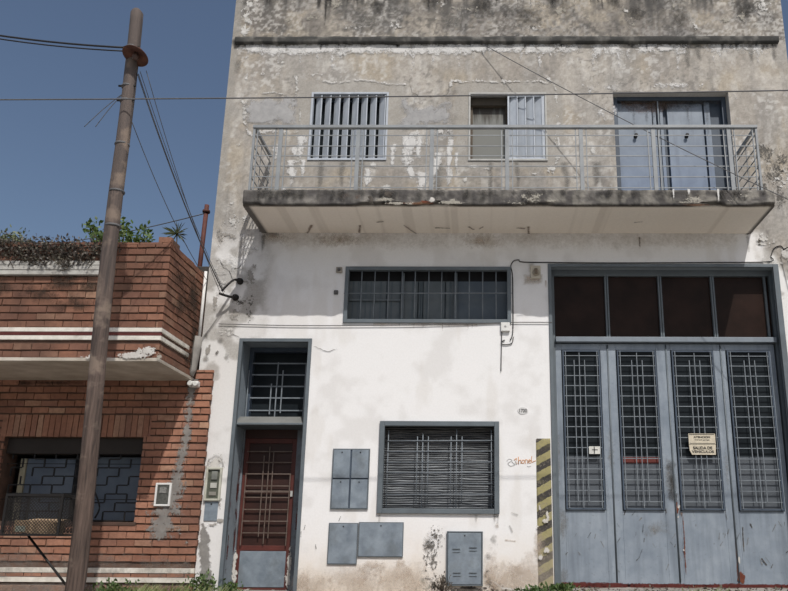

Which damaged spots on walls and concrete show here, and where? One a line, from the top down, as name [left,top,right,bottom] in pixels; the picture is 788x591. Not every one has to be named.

peeling [449,76,558,102]
peeling [390,99,458,190]
spalling [109,346,161,360]
corrosion [670,463,686,568]
corrosion [563,527,788,588]